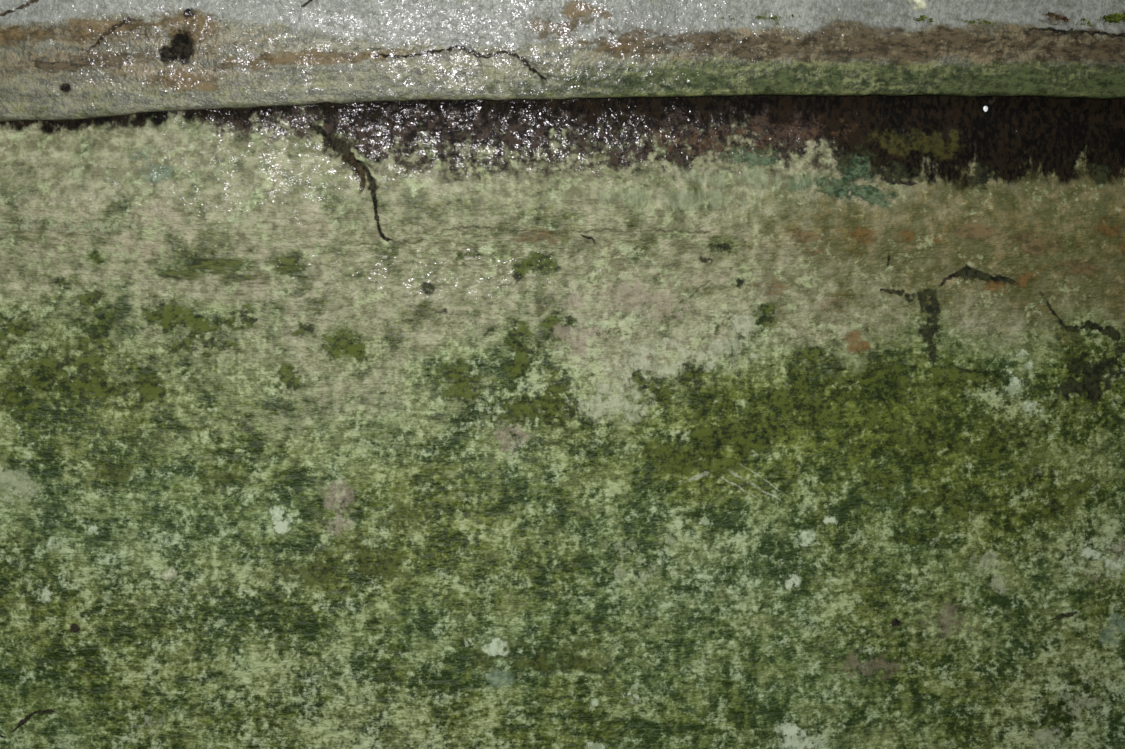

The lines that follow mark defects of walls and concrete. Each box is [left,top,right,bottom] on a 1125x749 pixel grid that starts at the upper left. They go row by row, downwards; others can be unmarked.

crack [0,0,38,16]
crack [369,45,585,84]
corrosion [532,1,1125,65]
damp [0,106,293,133]
damp [308,66,1125,189]
crack [310,125,710,244]
crack [880,255,1120,344]